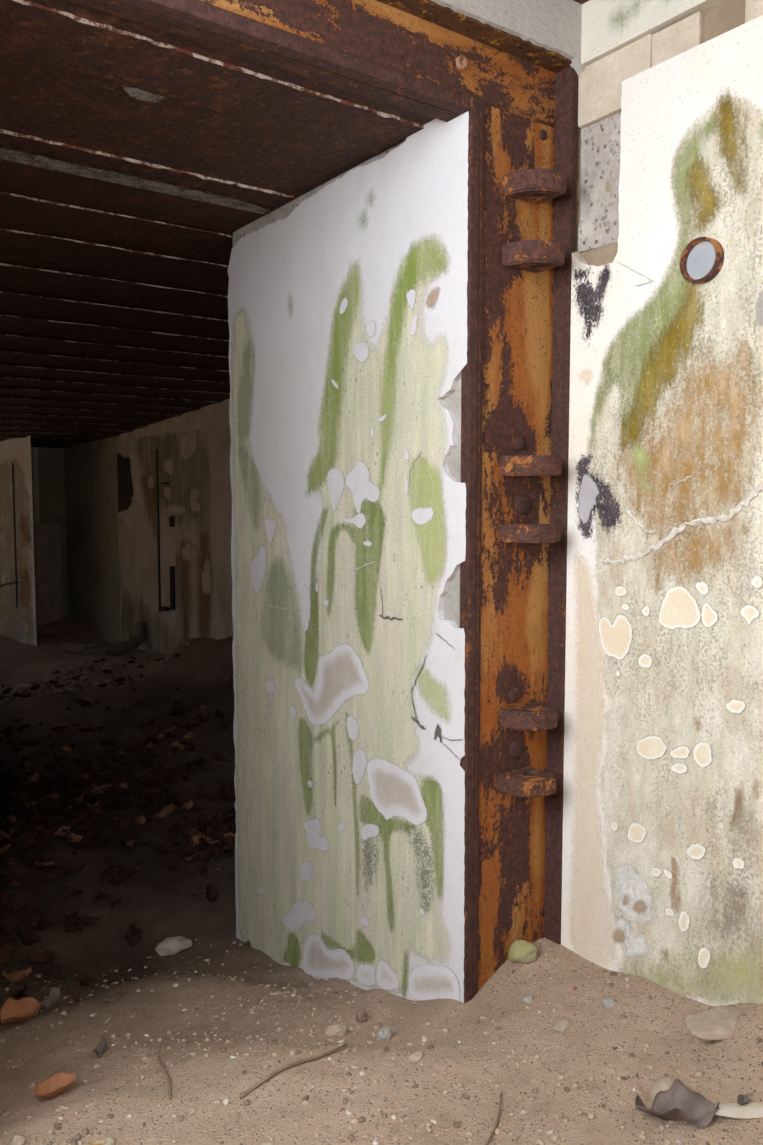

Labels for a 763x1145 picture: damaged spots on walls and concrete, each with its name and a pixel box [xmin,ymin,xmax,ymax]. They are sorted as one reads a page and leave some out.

spalling [578,112,621,252]
rust [426,289,439,307]
rust [177,534,211,640]
damp [231,238,448,991]
spalling [442,391,461,482]
peeling [598,581,718,678]
damp [570,101,763,1004]
crack [601,483,763,566]
crack [670,473,695,486]
rust [618,342,762,589]
peeling [290,643,427,840]
peeling [280,899,459,1001]